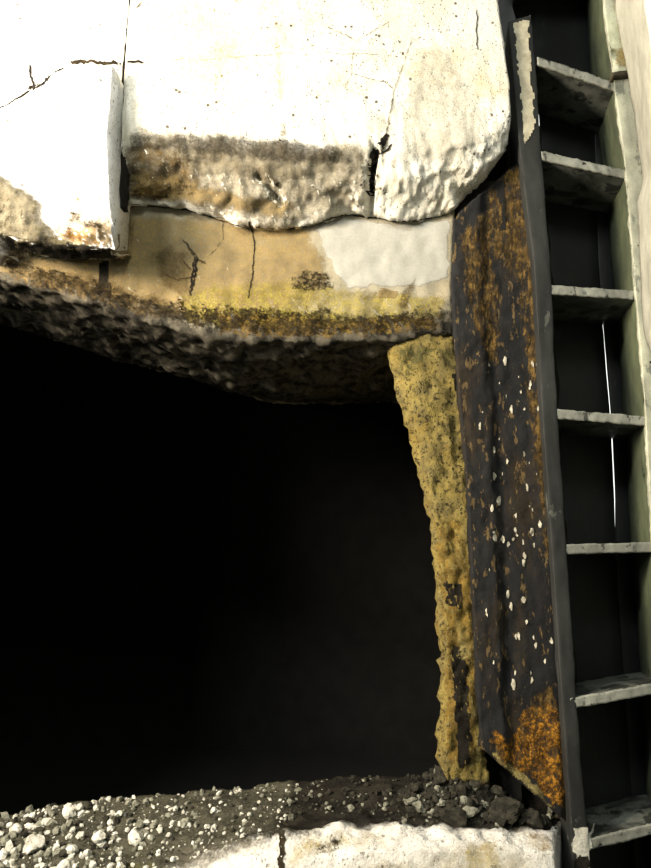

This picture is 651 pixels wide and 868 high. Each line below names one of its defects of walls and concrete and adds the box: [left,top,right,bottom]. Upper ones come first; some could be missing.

crack [0,0,412,196]
crack [119,129,445,298]
peeling [378,283,413,306]
rust [461,166,545,512]
rust [437,522,475,768]
rust [489,686,565,808]
crack [277,820,290,868]